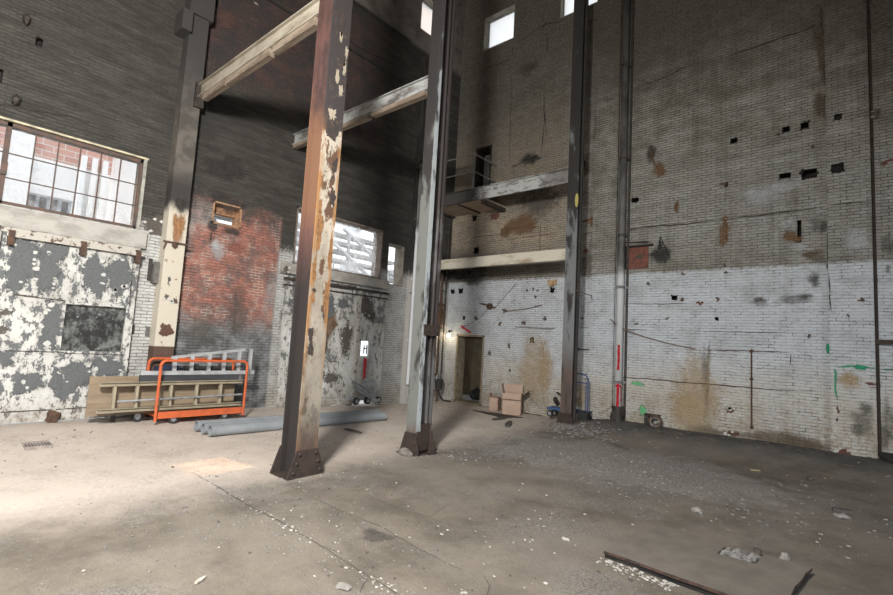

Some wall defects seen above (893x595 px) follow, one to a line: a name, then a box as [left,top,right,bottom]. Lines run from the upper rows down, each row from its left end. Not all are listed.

peeling [335,31,349,96]
rust [647,145,665,177]
rust [501,215,538,237]
rust [720,216,729,245]
peeling [80,250,135,300]
peeling [0,238,70,353]
peeling [328,294,350,318]
peeling [361,296,376,323]
peeling [0,350,16,368]
peeling [10,354,128,402]
peeling [325,320,354,359]
crack [198,475,399,595]